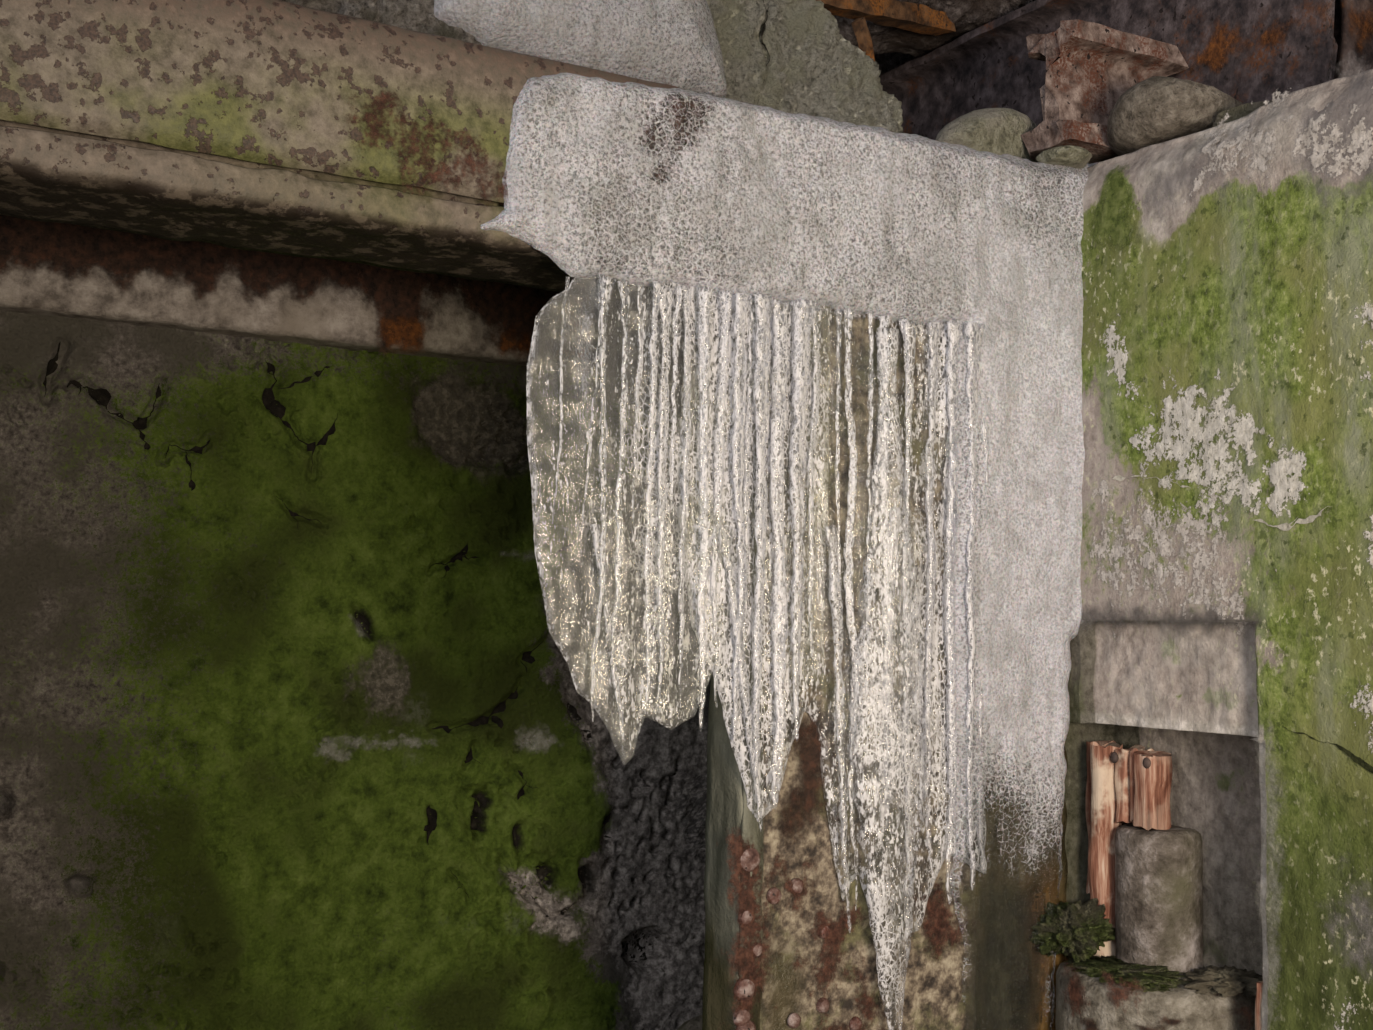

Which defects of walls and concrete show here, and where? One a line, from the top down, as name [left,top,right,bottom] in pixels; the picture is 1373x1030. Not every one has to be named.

corrosion [1196,24,1285,71]
corrosion [348,90,508,200]
damp [1146,70,1373,214]
crack [262,359,338,475]
crack [428,543,479,579]
efflorescence [1090,462,1250,639]
crack [432,640,544,764]
crack [567,703,643,754]
crack [1284,727,1373,773]
spalling [505,703,708,1030]